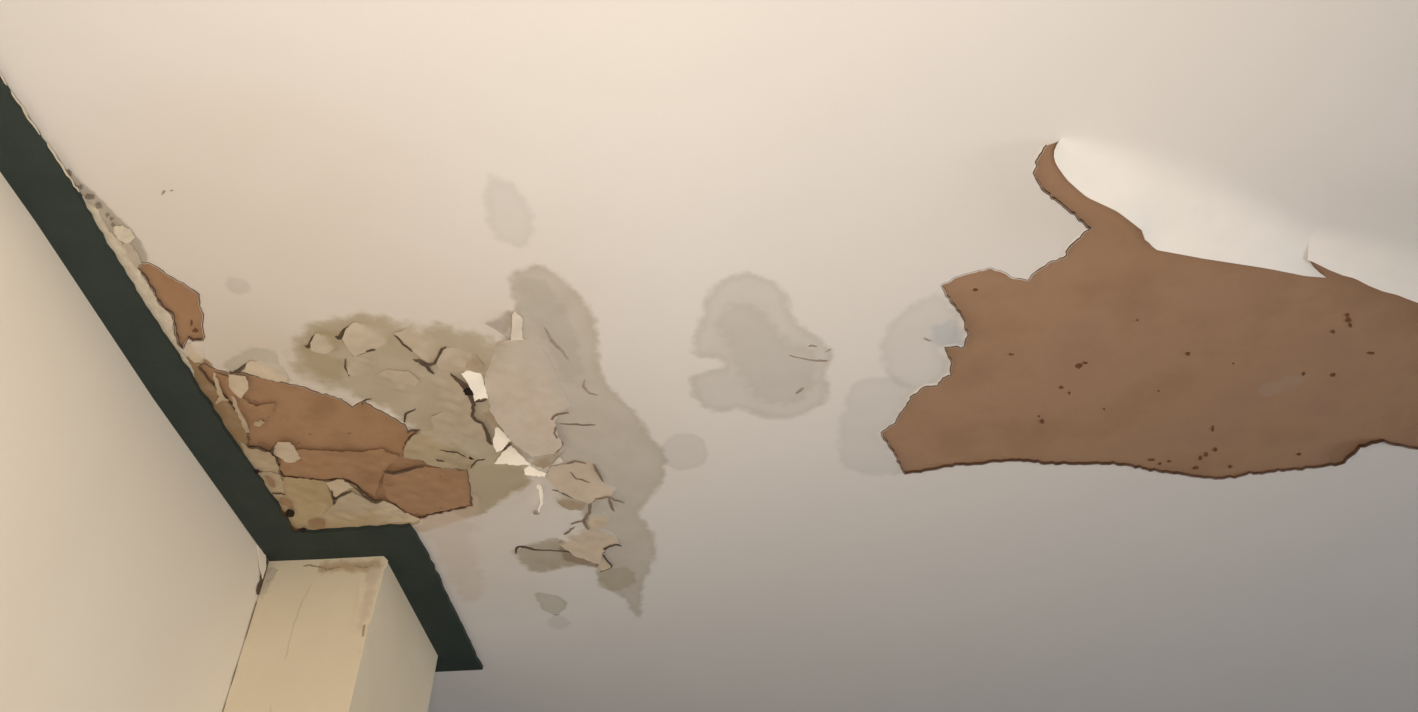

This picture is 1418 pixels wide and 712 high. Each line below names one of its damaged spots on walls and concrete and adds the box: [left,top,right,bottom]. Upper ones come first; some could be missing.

peeling [0,73,485,532]
crack [451,311,624,535]
peeling [531,451,559,469]
peeling [508,490,622,575]
leakage [478,168,712,620]
leakage [683,268,958,479]
peeling [878,135,1418,481]